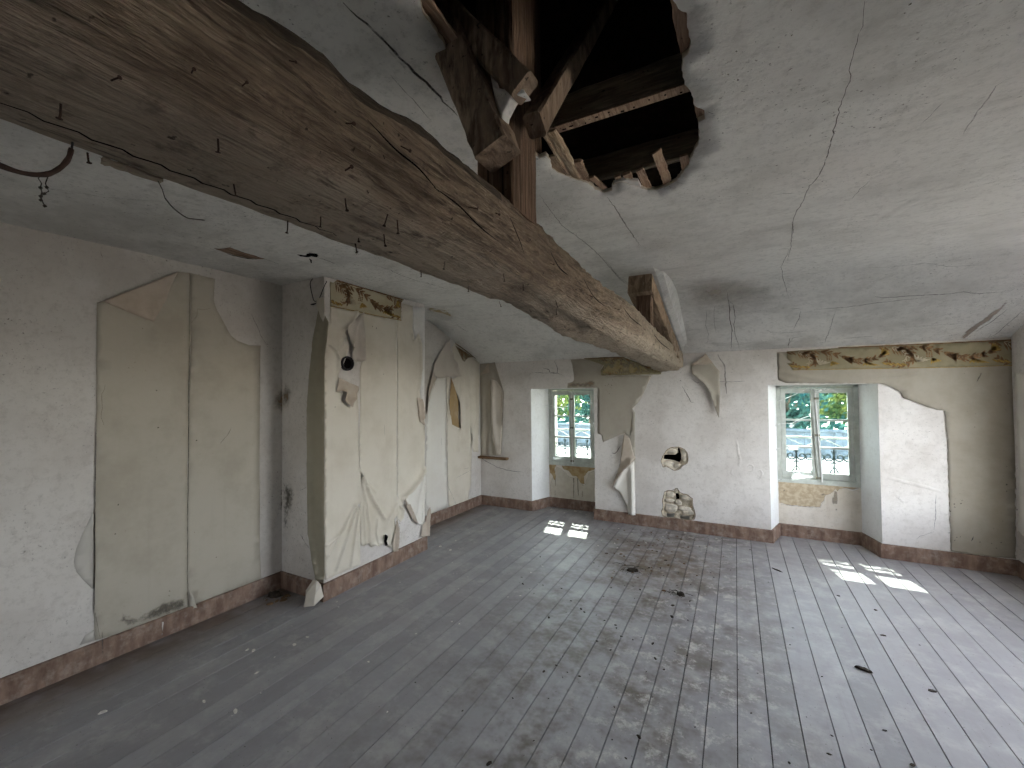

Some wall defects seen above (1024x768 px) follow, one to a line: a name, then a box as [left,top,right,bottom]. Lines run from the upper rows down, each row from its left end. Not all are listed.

crack [344,4,457,116]
crack [773,2,997,346]
hole [661,446,688,471]
spalling [661,488,696,520]